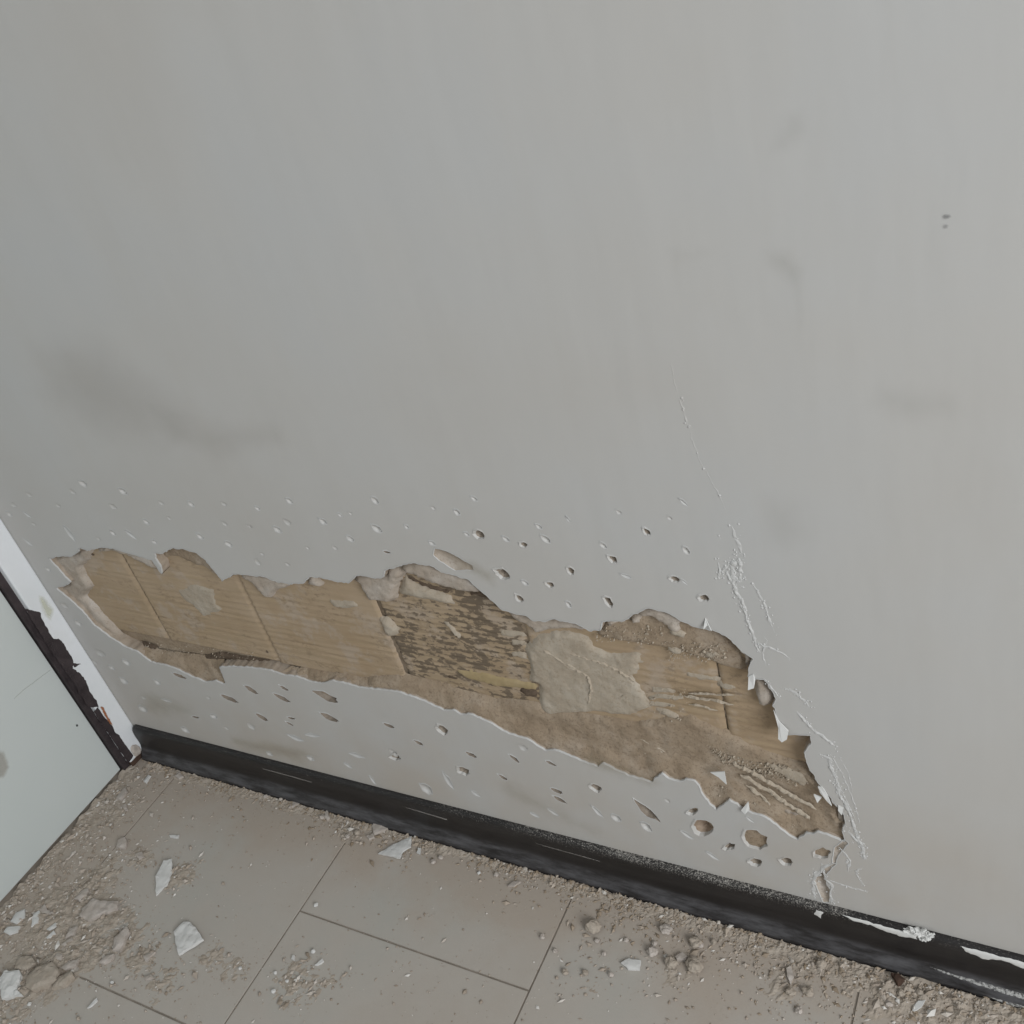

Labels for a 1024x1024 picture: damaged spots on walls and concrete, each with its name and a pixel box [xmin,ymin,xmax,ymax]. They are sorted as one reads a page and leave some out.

peeling [25,609,133,764]
spalling [48,547,846,860]
spalling [721,828,769,868]
crack [808,839,849,904]